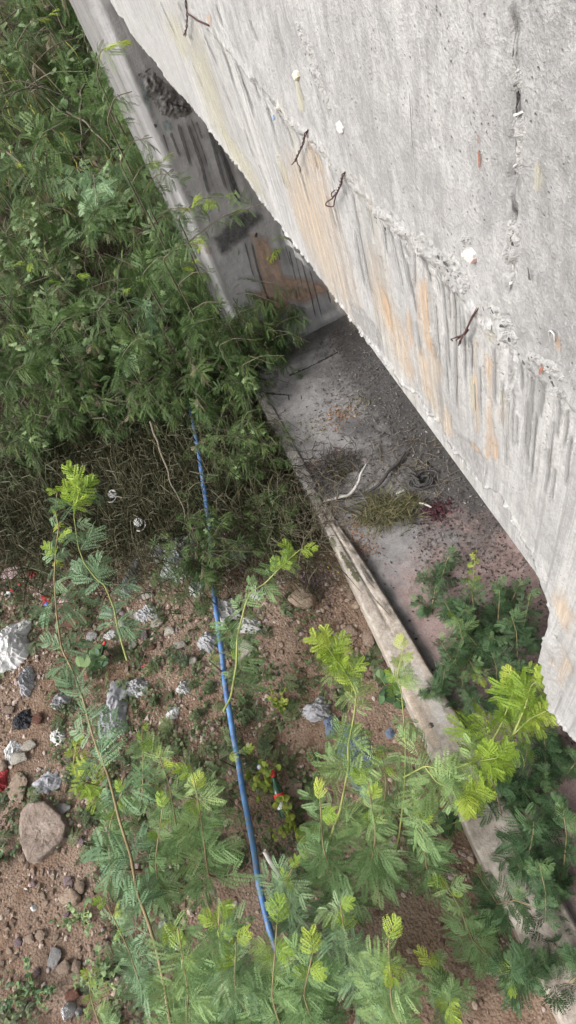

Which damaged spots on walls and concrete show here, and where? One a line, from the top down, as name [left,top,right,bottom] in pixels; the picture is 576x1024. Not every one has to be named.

crack [502,1,531,290]